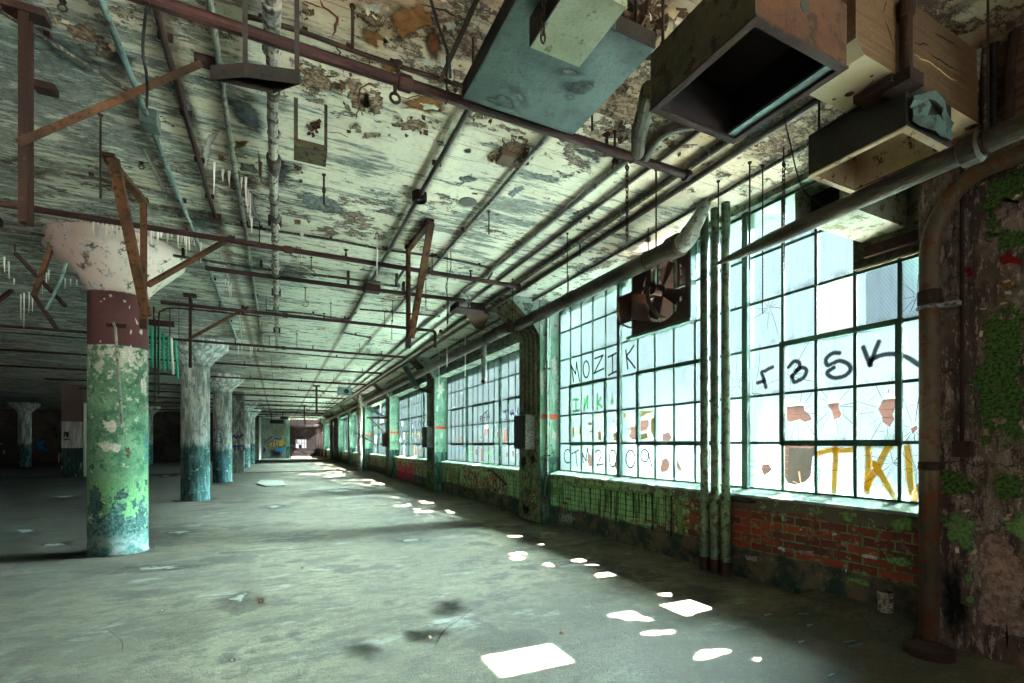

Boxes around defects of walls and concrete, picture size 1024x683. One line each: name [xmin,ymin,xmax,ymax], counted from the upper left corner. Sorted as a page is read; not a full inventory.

peeling [354,0,391,51]
flaking render [440,20,460,37]
peeling [299,62,443,139]
flaking render [420,59,462,95]
peeling [100,294,148,413]
peeling [970,279,1024,454]
peeling [88,420,130,520]
peeling [117,480,148,534]
spalling [940,466,1024,646]
water stain [942,566,968,633]